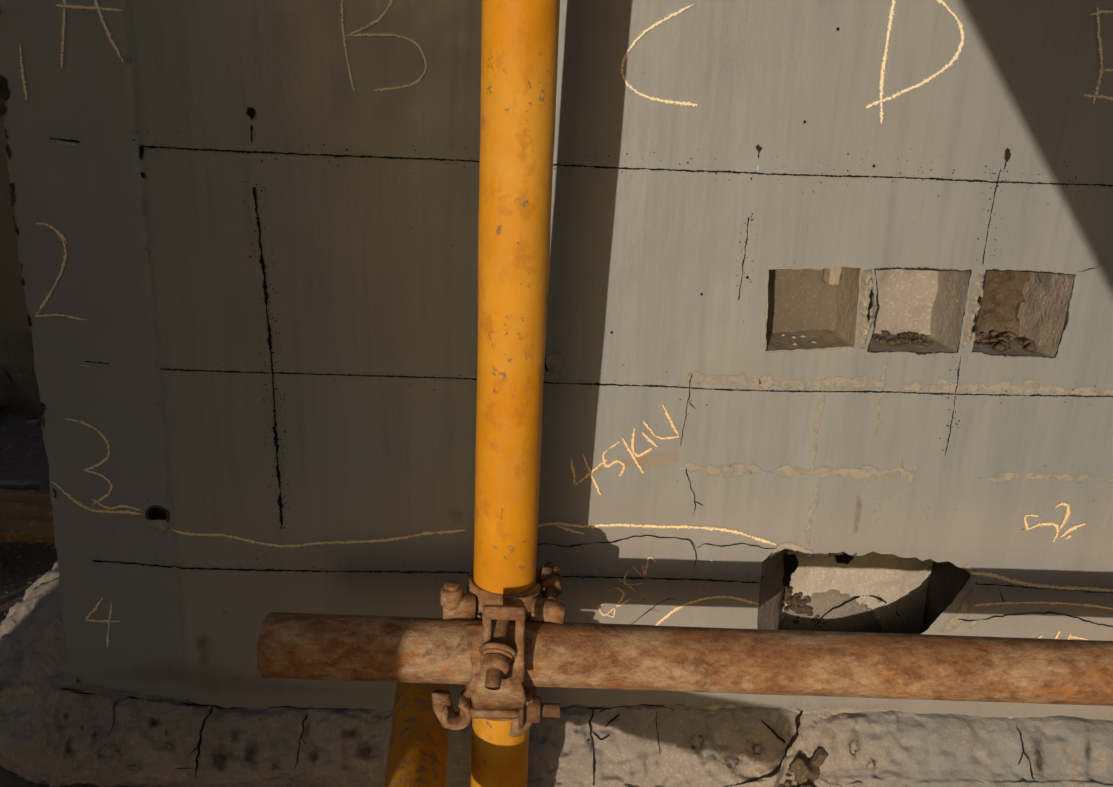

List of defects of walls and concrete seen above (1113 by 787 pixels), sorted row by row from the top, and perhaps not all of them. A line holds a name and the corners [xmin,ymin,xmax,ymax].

crack [537,375,775,566]
spalling [757,542,975,634]
crack [958,589,1113,627]
crack [60,688,349,779]
crack [560,704,674,786]
crack [726,709,803,787]